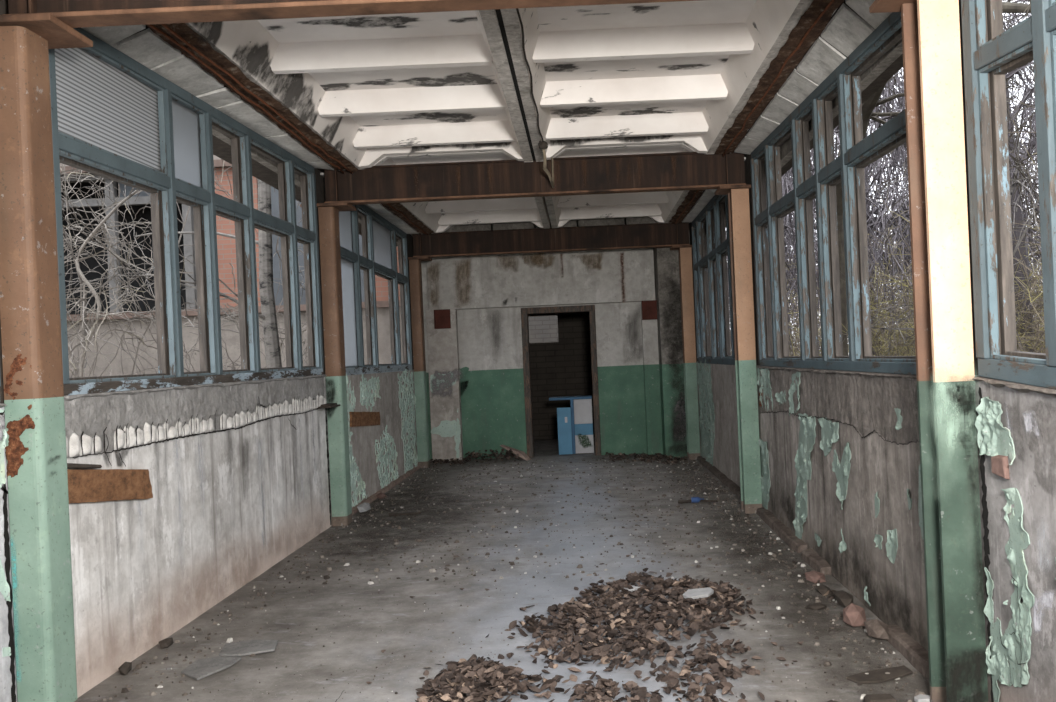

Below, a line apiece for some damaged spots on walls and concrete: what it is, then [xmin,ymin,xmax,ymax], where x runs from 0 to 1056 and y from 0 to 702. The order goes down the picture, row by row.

peeling [298,16,418,28]
spalling [146,21,497,174]
peeling [554,107,601,118]
peeling [550,135,672,146]
peeling [620,107,672,115]
spalling [714,0,844,157]
corrosion [3,353,32,400]
corrosion [5,405,35,478]
flaking render [64,377,326,466]
flaking render [757,368,919,547]
peeling [0,558,11,601]
peeling [975,397,1035,702]